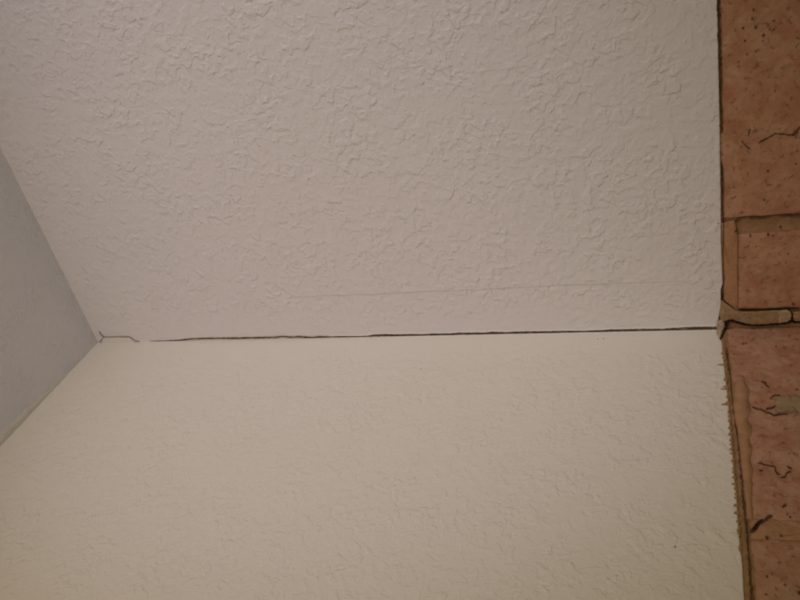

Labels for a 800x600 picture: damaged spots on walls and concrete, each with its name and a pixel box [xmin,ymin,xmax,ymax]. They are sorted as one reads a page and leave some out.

crack [164,163,800,600]